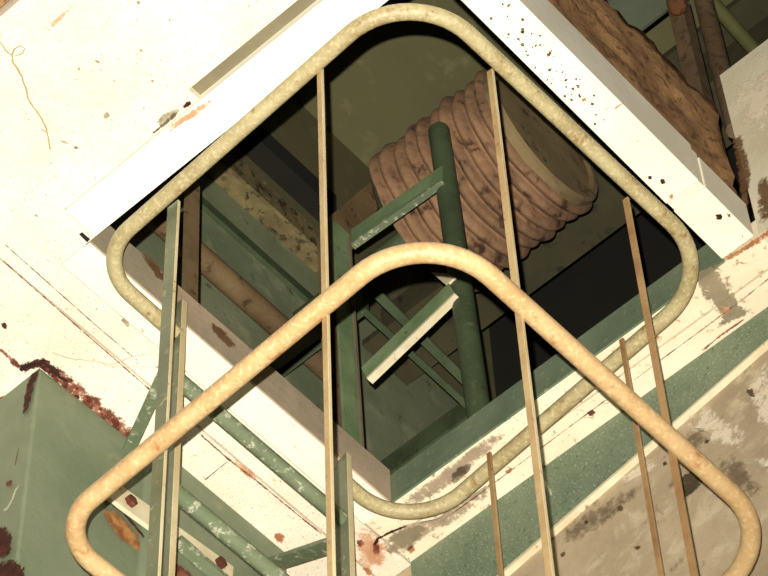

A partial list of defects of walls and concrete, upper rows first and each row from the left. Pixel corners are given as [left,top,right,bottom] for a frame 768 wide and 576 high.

damp [698,265,749,325]
corrosion [23,369,39,413]
corrosion [0,527,25,576]
corrosion [103,503,144,551]
corrosion [175,563,191,576]
corrosion [357,527,404,575]